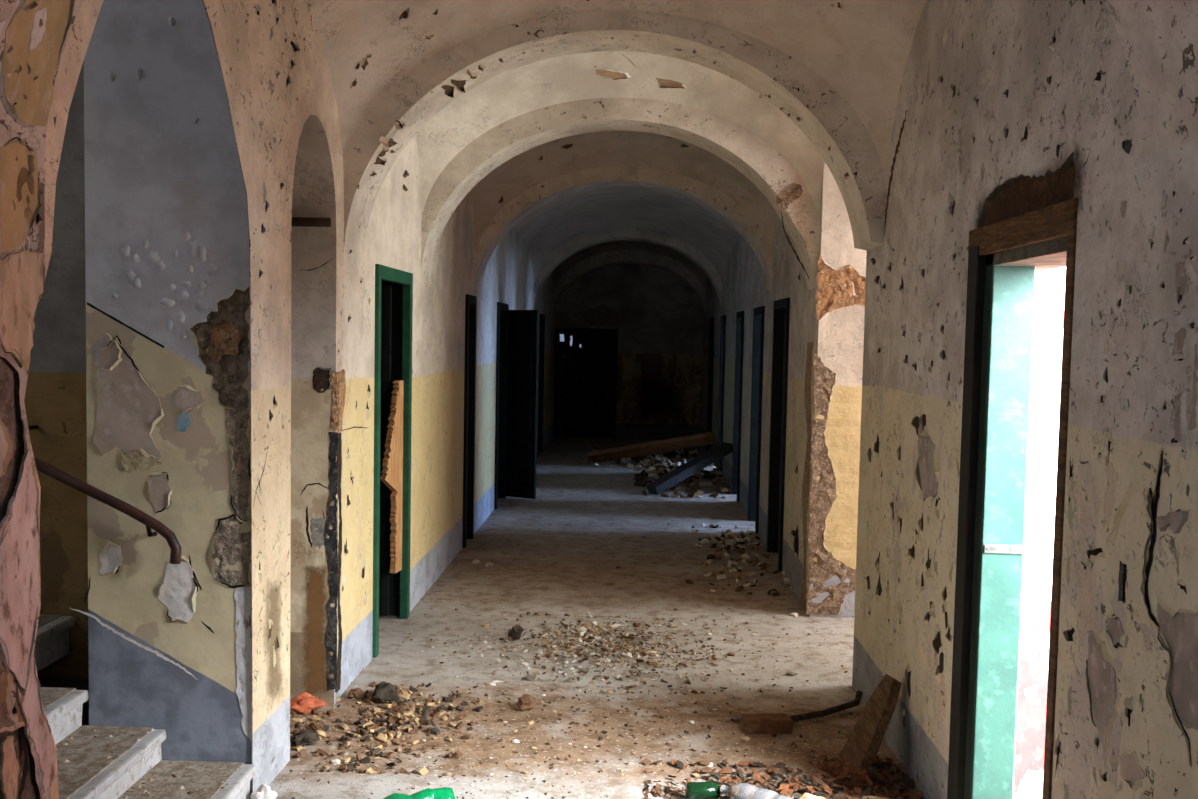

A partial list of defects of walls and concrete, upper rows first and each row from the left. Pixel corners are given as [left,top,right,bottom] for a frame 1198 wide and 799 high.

peeling [256,0,300,95]
peeling [441,58,504,98]
peeling [656,78,687,89]
peeling [92,333,191,514]
peeling [157,555,198,624]
flaking render [189,287,266,741]
flaking render [791,342,953,683]
peeling [1017,734,1061,793]
peeling [1036,328,1105,600]
peeling [1024,614,1152,799]
crack [1106,449,1192,767]
peeling [1157,596,1198,731]